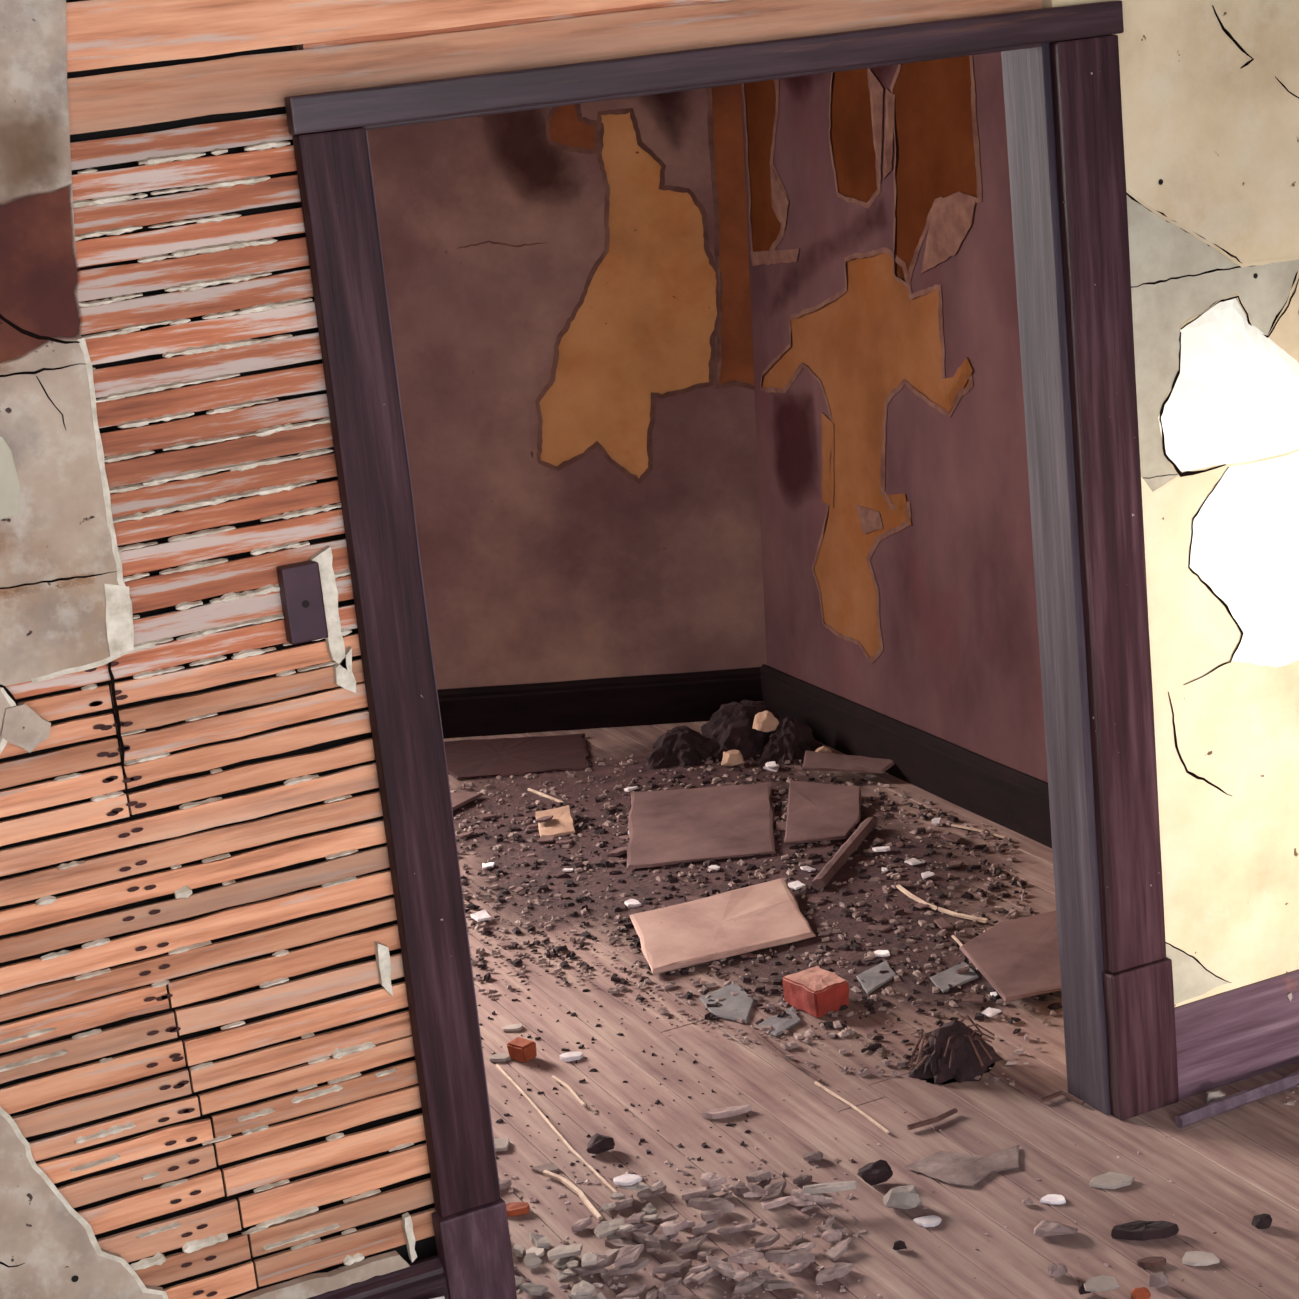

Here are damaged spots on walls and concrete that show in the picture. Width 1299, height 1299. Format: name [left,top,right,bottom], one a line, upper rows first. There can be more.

spalling [67,45,293,79]
crack [1212,5,1299,99]
spalling [71,160,145,175]
spalling [70,106,286,143]
spalling [78,202,306,241]
crack [1126,192,1251,288]
peeling [1126,188,1299,496]
spalling [0,307,380,850]
spalling [0,800,387,911]
spalling [0,884,323,967]
spalling [210,894,394,943]
spalling [0,920,437,1299]